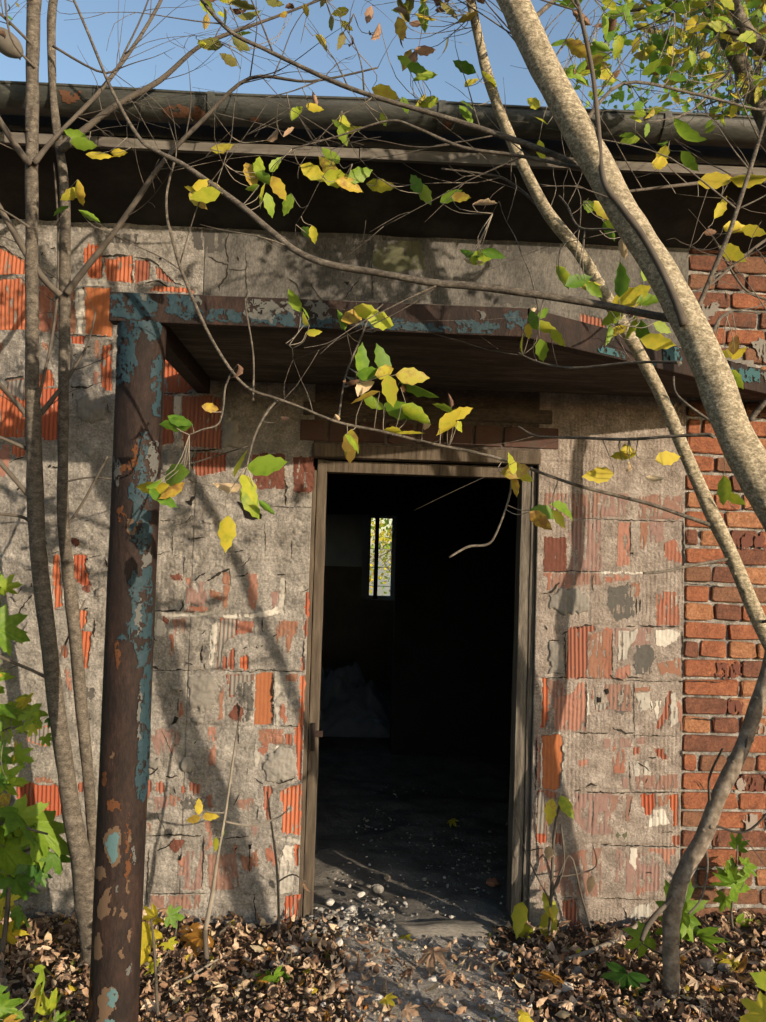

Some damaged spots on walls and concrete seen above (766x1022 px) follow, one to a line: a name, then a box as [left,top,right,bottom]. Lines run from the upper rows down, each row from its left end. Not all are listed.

spalling [0,249,25,331]
peeling [70,243,339,391]
peeling [355,310,527,334]
spalling [0,378,25,457]
spalling [39,369,58,441]
spalling [113,354,227,802]
spalling [79,609,92,668]
spalling [216,618,273,726]
spalling [565,624,609,712]
spalling [656,691,671,729]
peeling [94,826,136,920]
peeling [96,986,119,1022]